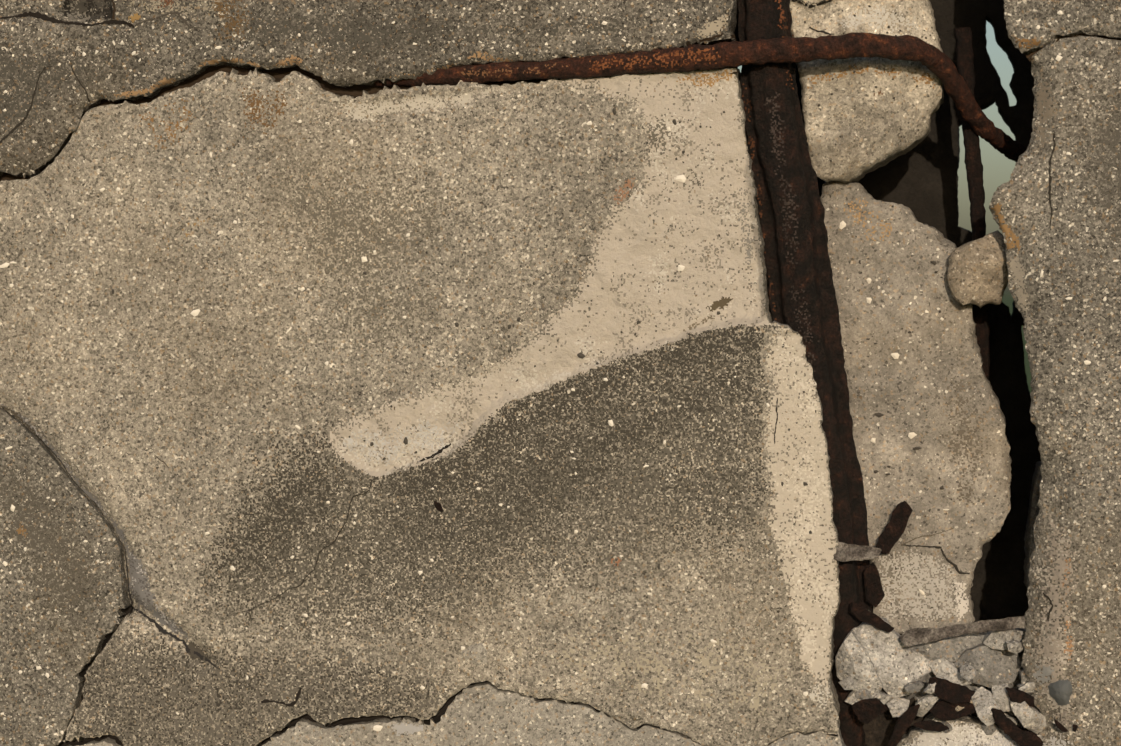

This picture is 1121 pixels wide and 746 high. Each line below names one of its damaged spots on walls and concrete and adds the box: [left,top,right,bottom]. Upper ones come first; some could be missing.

crack [0,0,569,143]
rust [389,51,513,78]
rust [665,69,733,87]
spalling [1007,251,1034,334]
spalling [317,69,838,696]
crack [36,435,220,702]
leakage [66,324,788,746]
rust [834,501,913,632]
spalling [878,542,971,626]
crack [55,735,124,746]
crack [259,681,489,746]
spalling [905,721,1018,746]